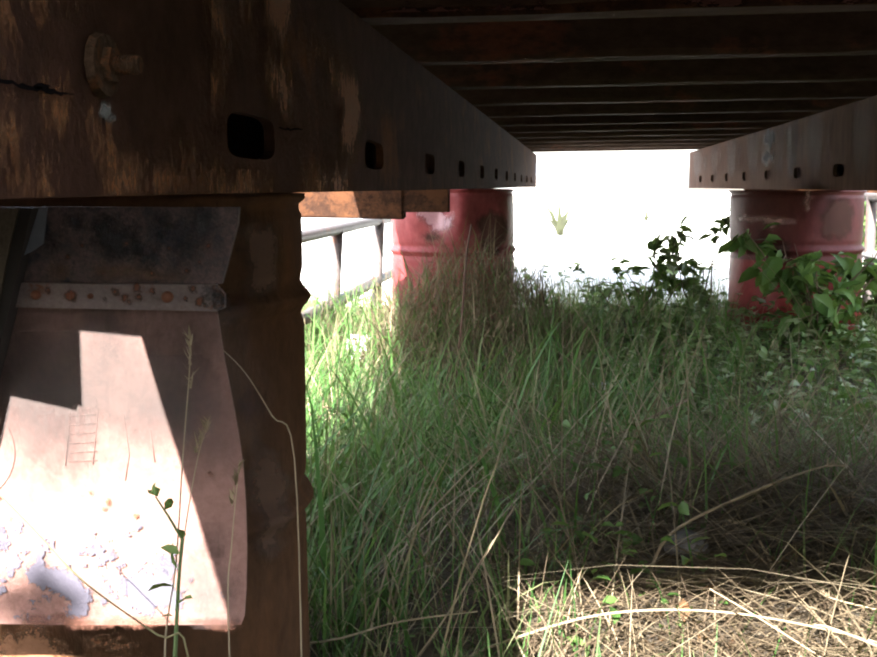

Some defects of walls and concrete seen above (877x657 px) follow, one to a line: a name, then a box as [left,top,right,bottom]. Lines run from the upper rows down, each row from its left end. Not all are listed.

crack [0,79,74,96]
corrosion [86,107,139,195]
corrosion [153,149,273,194]
corrosion [302,46,361,192]
peeling [14,536,194,620]